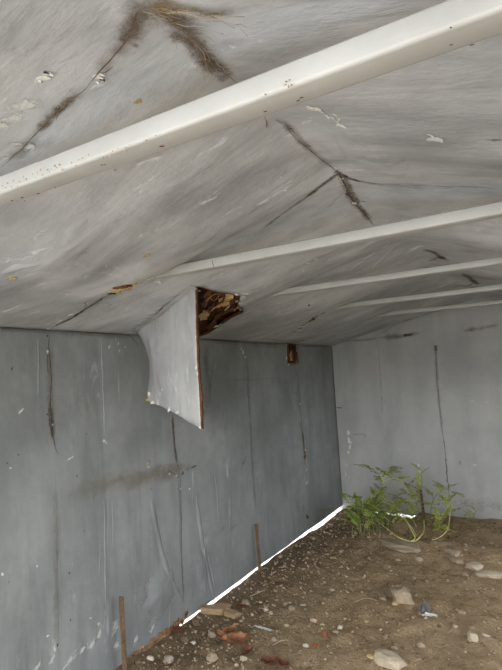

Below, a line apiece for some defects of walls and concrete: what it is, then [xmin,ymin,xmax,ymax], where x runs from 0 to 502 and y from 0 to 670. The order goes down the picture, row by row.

crack [1,12,137,167]
damp [122,3,248,92]
crack [264,116,374,228]
spalling [108,276,162,295]
crack [1,288,139,453]
spalling [286,340,305,365]
crack [435,346,450,488]